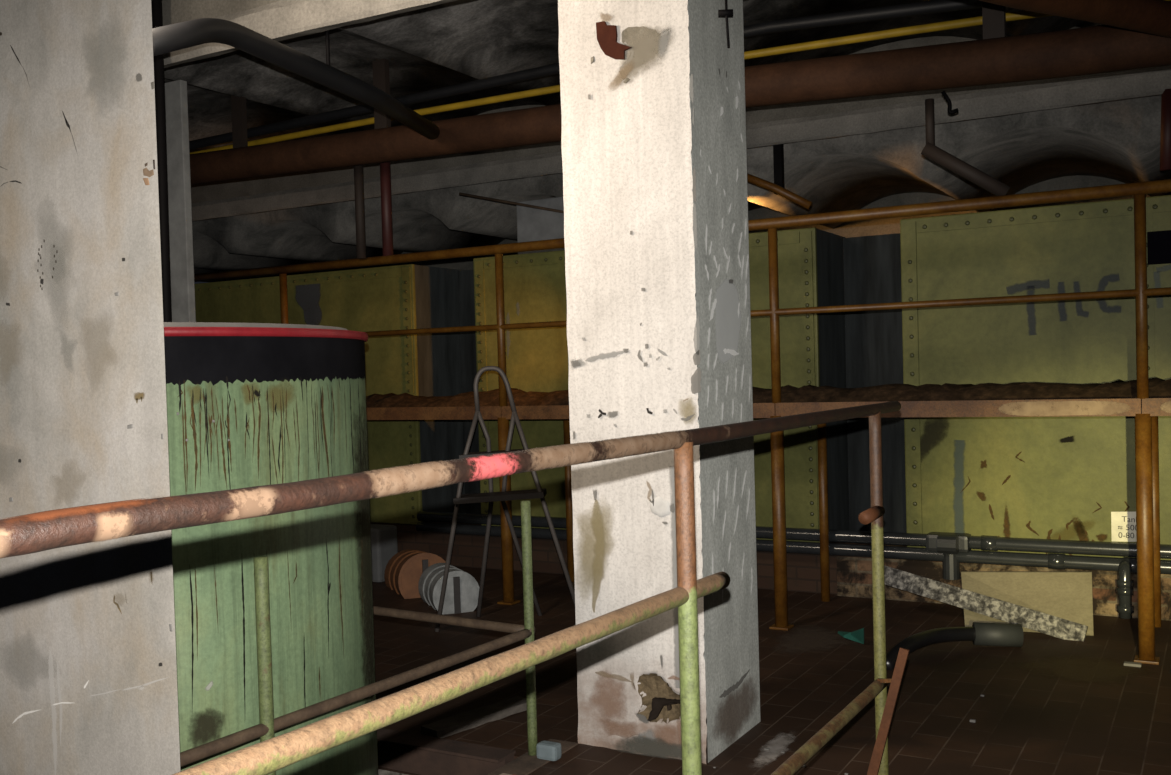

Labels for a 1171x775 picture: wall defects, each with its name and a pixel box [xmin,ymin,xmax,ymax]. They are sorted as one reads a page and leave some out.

spalling [613,26,671,85]
rust [178,384,300,489]
rust [313,386,369,477]
rust [356,499,375,703]
leakage [582,491,609,613]
peeling [647,466,677,588]
spalling [631,607,681,744]